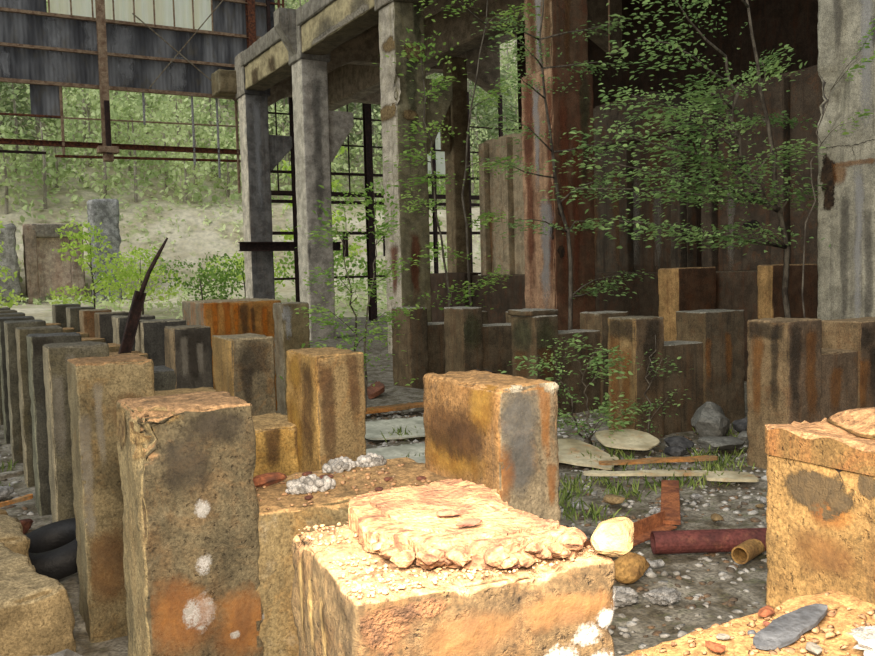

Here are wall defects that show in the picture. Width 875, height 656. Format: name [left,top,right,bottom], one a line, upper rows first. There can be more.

rust [524,82,534,264]
rust [546,87,580,278]
rust [212,302,239,335]
water stain [504,399,535,486]
water stain [196,501,210,517]
water stain [183,597,214,630]